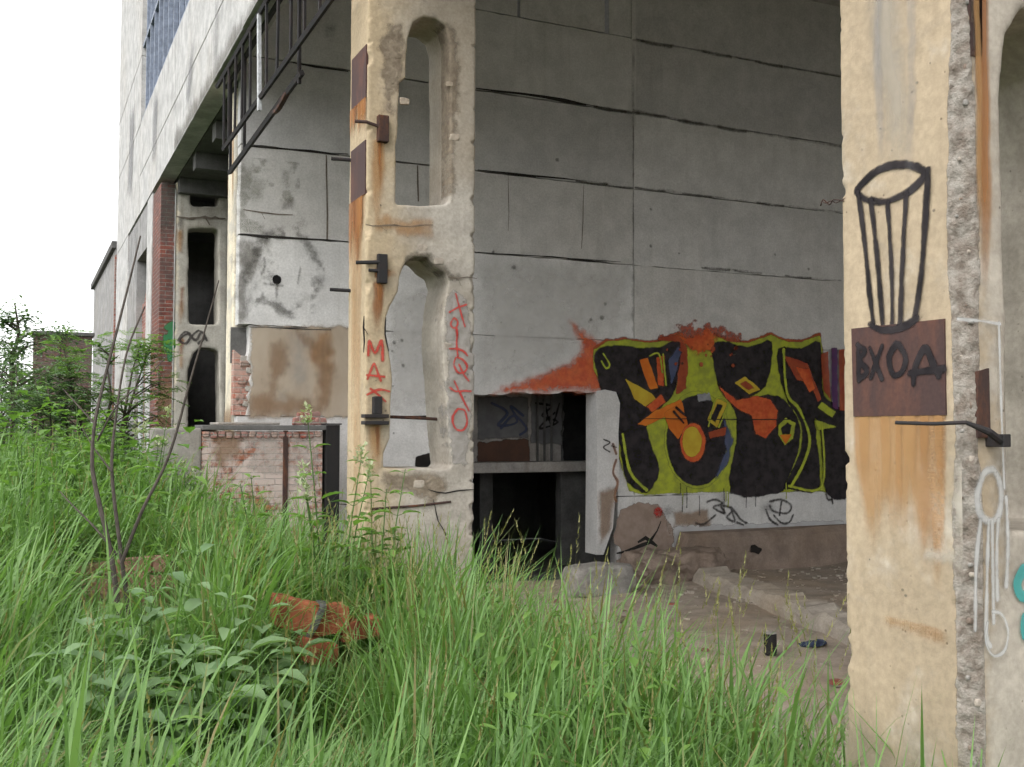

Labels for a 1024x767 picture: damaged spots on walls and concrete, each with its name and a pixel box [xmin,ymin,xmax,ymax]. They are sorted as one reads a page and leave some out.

corrosion [350,96,366,131]
corrosion [974,0,990,224]
corrosion [374,141,383,186]
corrosion [349,196,362,252]
water stain [236,247,259,308]
corrosion [373,271,389,317]
spalling [230,327,252,415]
water stain [249,326,348,418]
spalling [946,0,986,767]
corrosion [855,415,944,548]